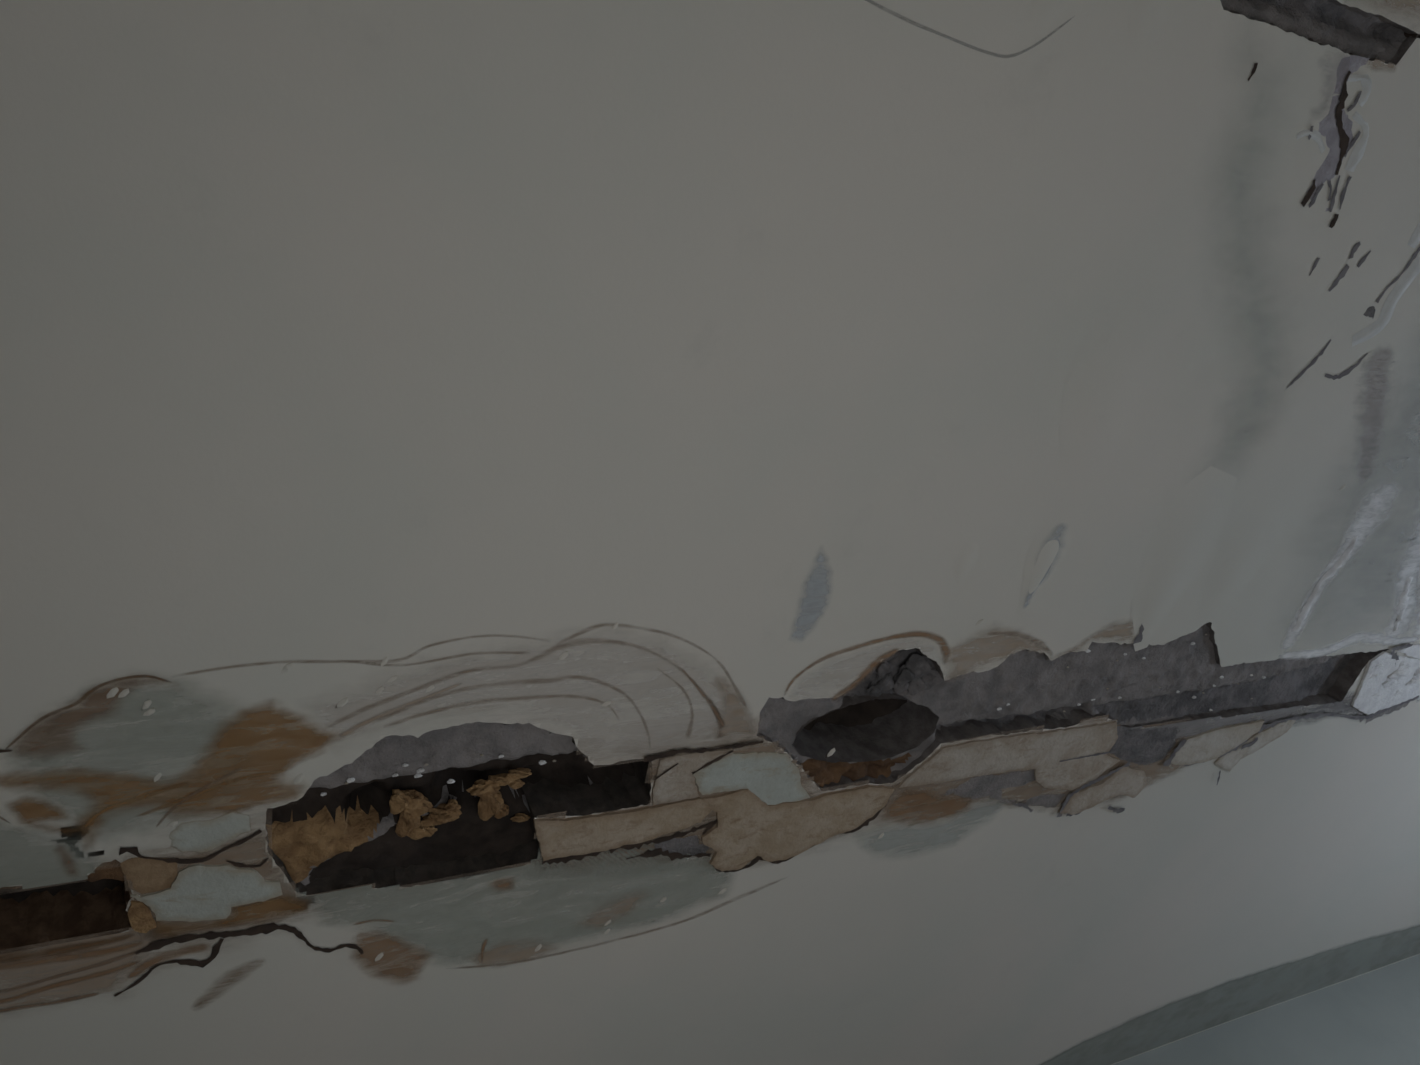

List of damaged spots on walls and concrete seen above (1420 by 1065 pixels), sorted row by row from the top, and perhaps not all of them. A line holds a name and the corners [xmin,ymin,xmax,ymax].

crack [866,0,1069,58]
crack [1247,63,1258,81]
flaking render [1220,0,1420,228]
flaking render [0,622,1389,954]
crack [114,923,364,997]